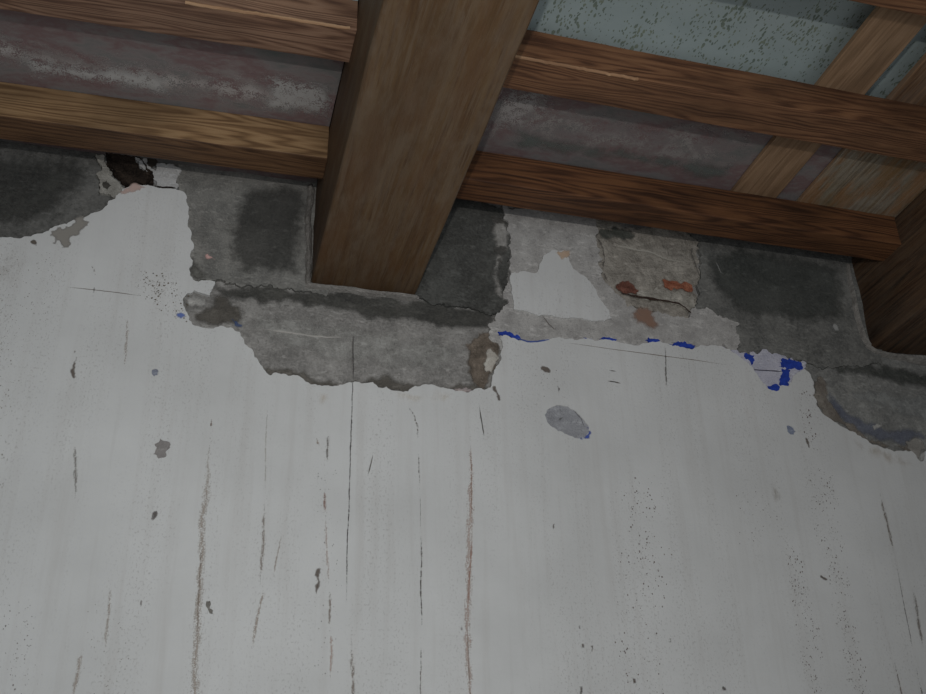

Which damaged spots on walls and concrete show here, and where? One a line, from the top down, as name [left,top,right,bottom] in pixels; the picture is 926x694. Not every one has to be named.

flaking render [0,141,182,247]
flaking render [183,205,926,461]
corrosion [634,308,657,328]